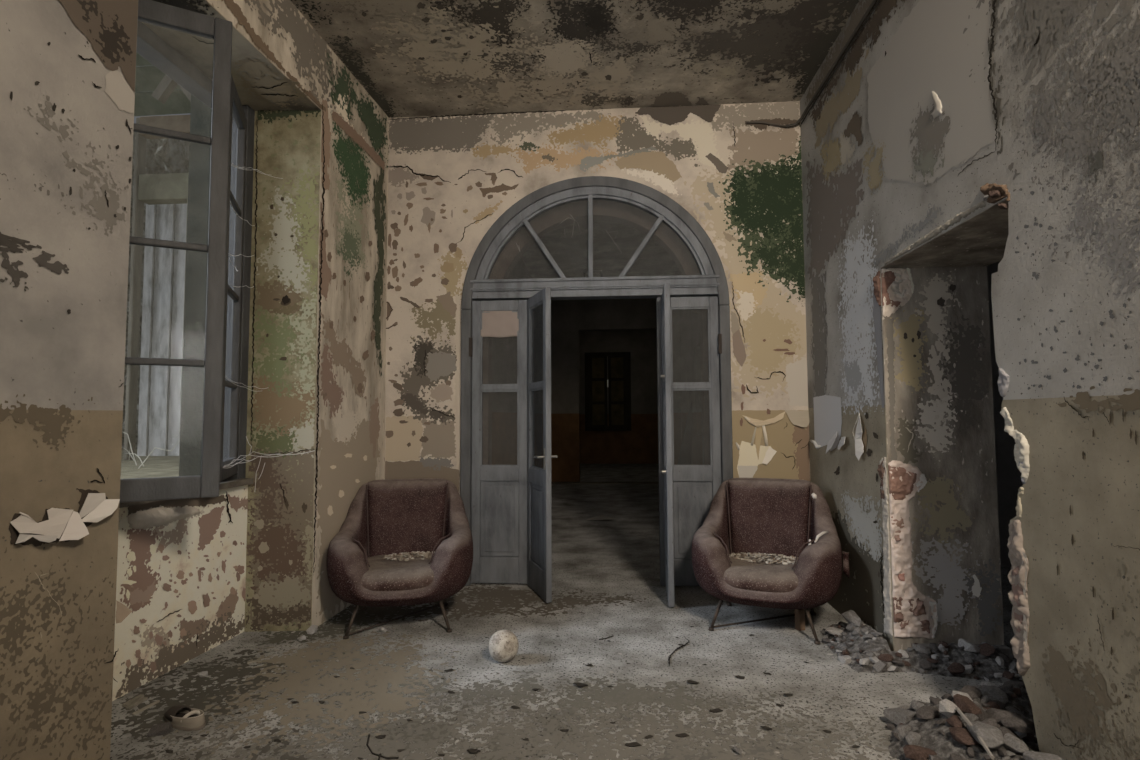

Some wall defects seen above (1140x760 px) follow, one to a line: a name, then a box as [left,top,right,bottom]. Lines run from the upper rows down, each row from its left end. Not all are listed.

flaking render [58,0,138,92]
peeling [120,0,460,672]
peeling [387,173,518,325]
crack [391,166,522,183]
water stain [232,0,1003,639]
peeling [614,151,682,183]
flaking render [635,92,721,126]
crack [958,0,998,175]
flaking render [9,488,108,547]
peeling [737,441,772,478]
flaking render [862,268,938,639]
flaking render [997,368,1030,676]